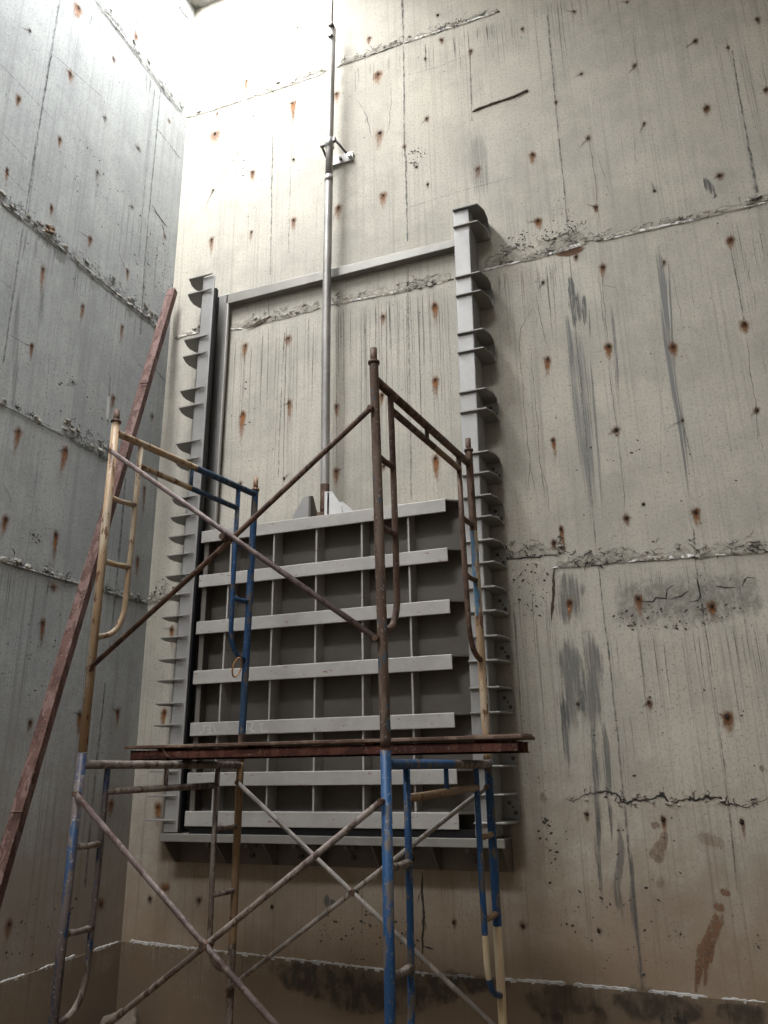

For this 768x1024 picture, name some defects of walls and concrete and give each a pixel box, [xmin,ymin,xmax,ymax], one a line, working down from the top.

peeling [500,198,573,255]
damp [536,265,599,473]
damp [657,252,686,470]
crack [642,552,768,602]
damp [560,638,601,760]
rust [721,711,733,730]
damp [592,732,611,828]
crack [569,786,767,808]
damp [282,963,488,1010]